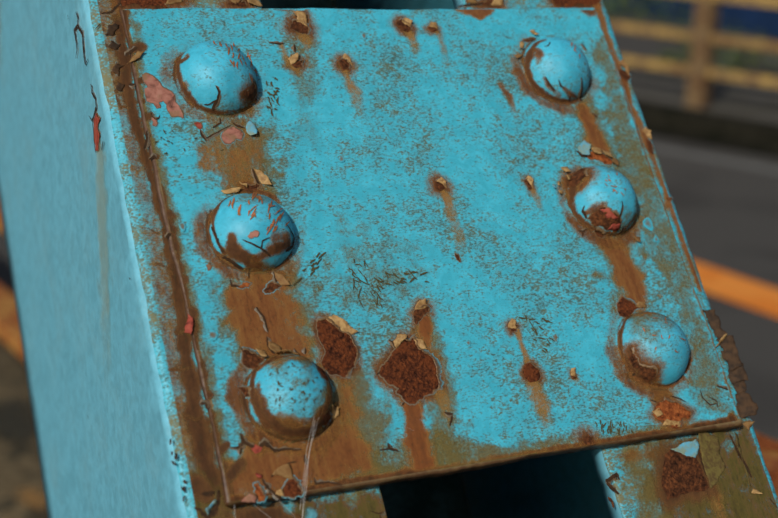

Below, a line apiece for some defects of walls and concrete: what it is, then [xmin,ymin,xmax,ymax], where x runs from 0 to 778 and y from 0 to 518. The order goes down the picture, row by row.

peeling [89,84,103,152]
corrosion [498,83,514,107]
corrosion [511,39,611,158]
corrosion [581,2,702,292]
corrosion [97,0,460,518]
corrosion [558,171,692,401]
peeling [312,314,362,383]
peeling [373,298,449,470]
corrosion [472,413,737,463]
peeling [649,393,696,431]
peeling [653,432,726,512]
peeling [703,309,778,453]